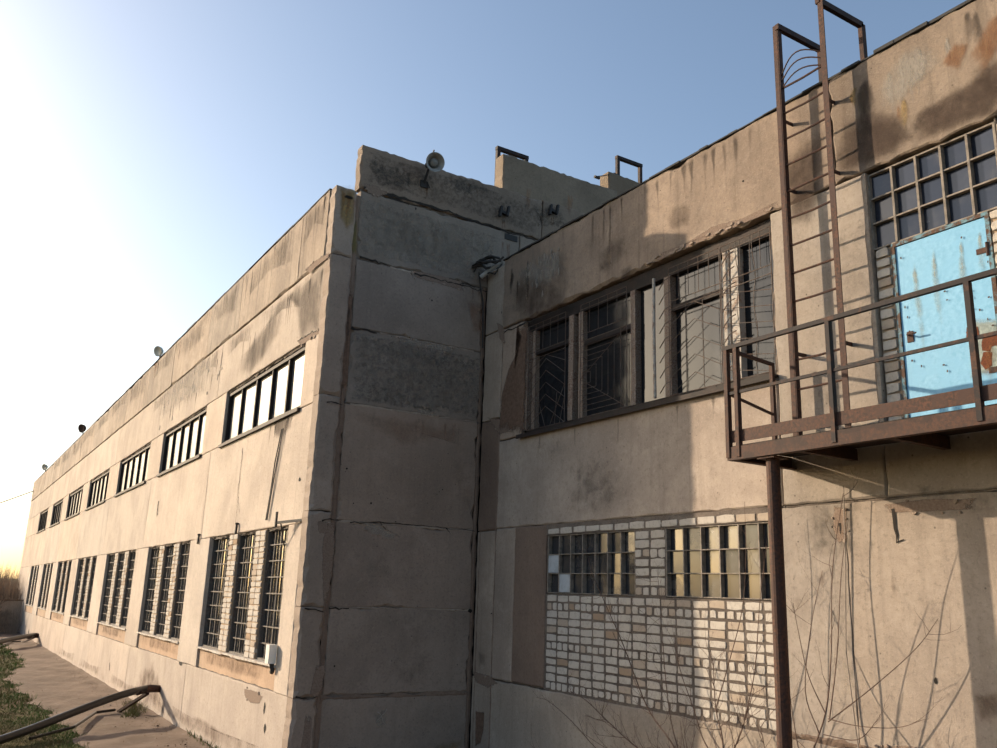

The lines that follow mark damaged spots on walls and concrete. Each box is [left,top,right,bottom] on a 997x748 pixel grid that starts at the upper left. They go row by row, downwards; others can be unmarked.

leakage [918,66,997,133]
leakage [843,119,905,165]
leakage [243,332,267,365]
leakage [270,416,292,435]
crack [891,509,904,543]
spalling [244,687,262,703]